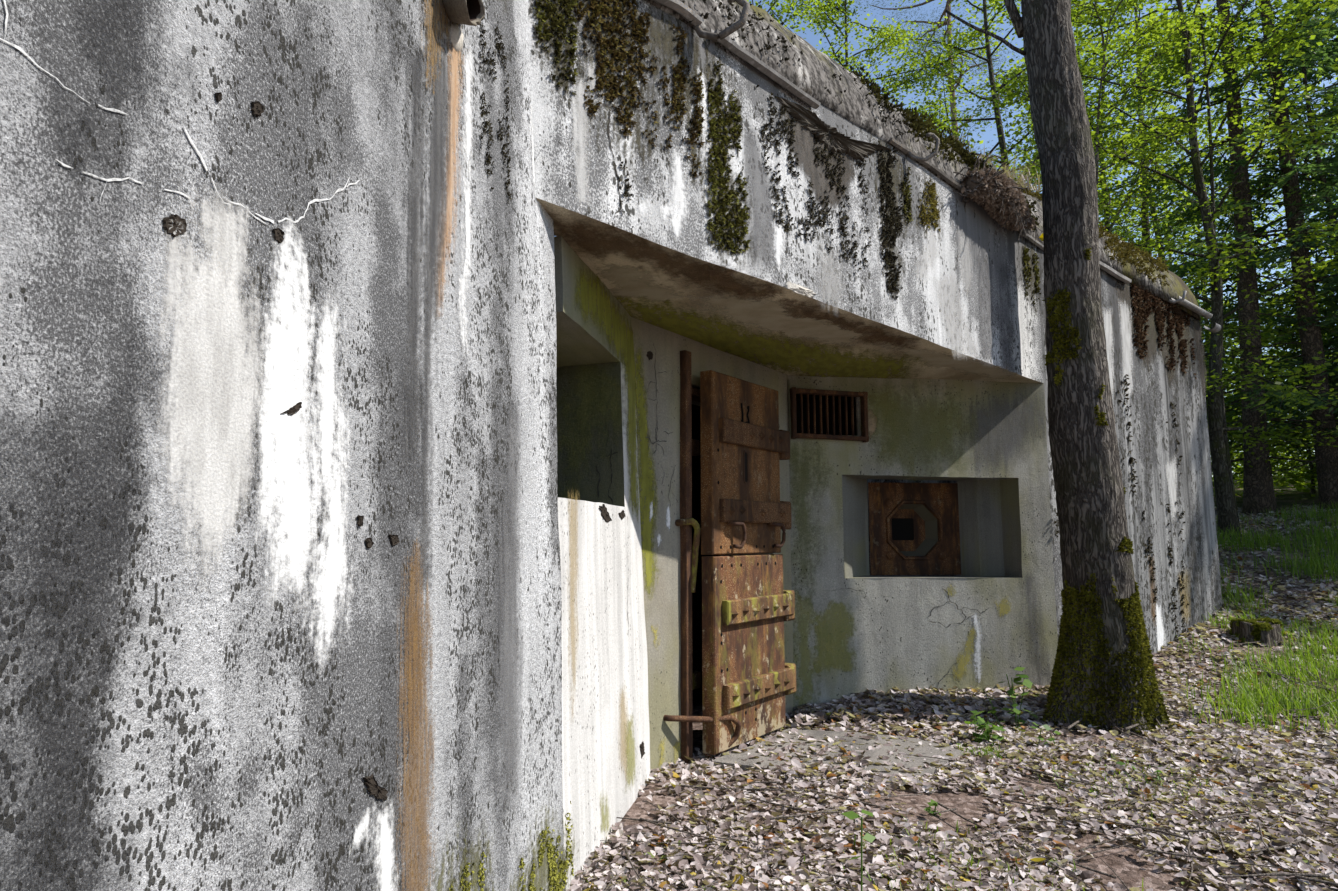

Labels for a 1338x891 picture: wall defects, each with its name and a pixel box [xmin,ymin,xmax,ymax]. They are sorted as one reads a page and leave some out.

crack [0,0,128,115]
crack [56,125,361,225]
rust [424,0,462,304]
damp [572,66,601,205]
damp [638,149,689,237]
damp [697,68,713,177]
damp [780,103,855,211]
damp [1104,281,1207,407]
damp [0,201,352,891]
damp [1166,459,1177,518]
crack [928,588,989,628]
rust [396,543,435,891]